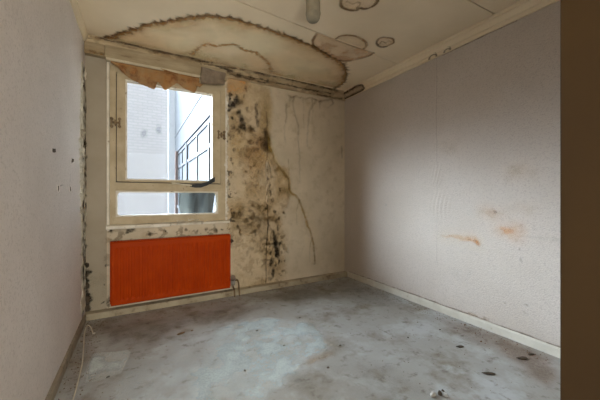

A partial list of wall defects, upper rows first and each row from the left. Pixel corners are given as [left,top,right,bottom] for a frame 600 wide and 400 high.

leakage [100,13,372,94]
leakage [227,84,274,161]
leakage [82,263,92,315]